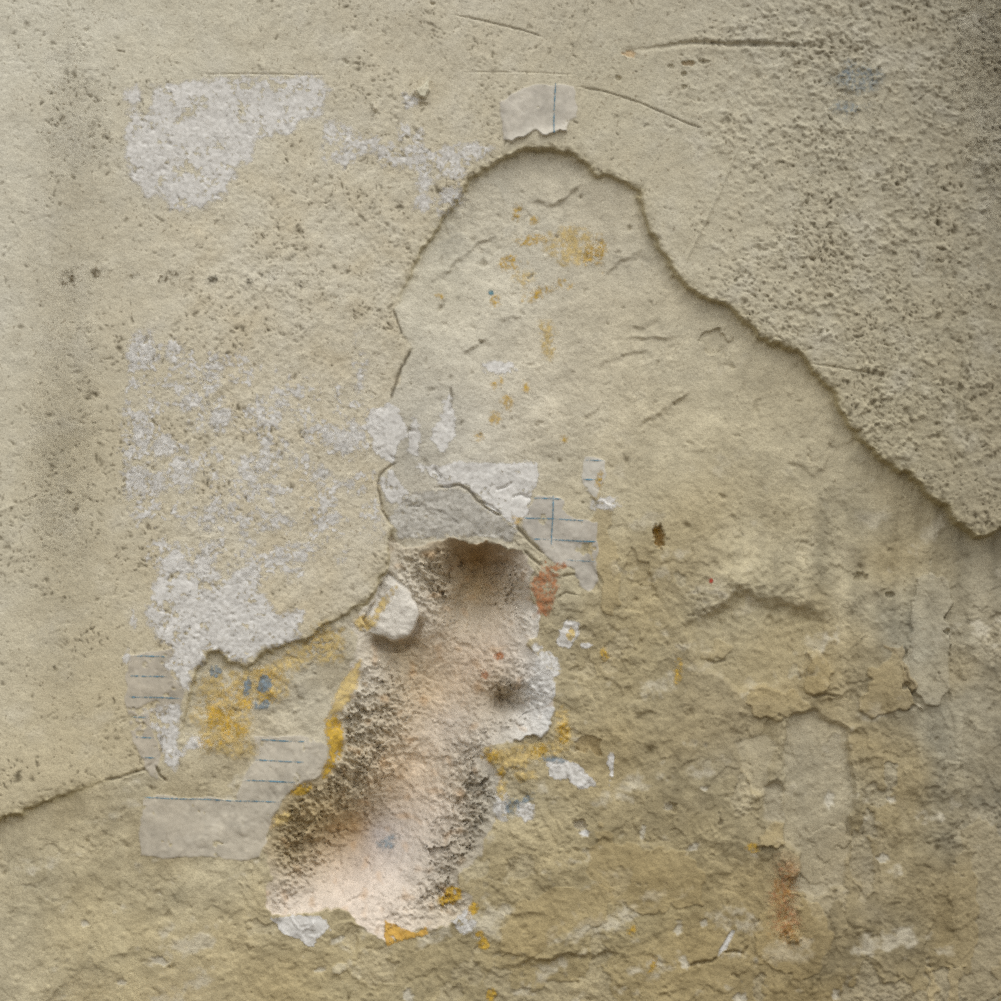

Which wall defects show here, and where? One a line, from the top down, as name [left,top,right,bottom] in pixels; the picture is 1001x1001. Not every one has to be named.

peeling [123,75,331,211]
peeling [323,120,494,212]
peeling [120,330,253,528]
peeling [170,374,305,546]
peeling [245,542,315,578]
peeling [297,406,376,456]
peeling [312,471,366,533]
crack [388,308,414,404]
crack [447,385,455,409]
crack [377,462,580,601]
crack [102,736,169,784]